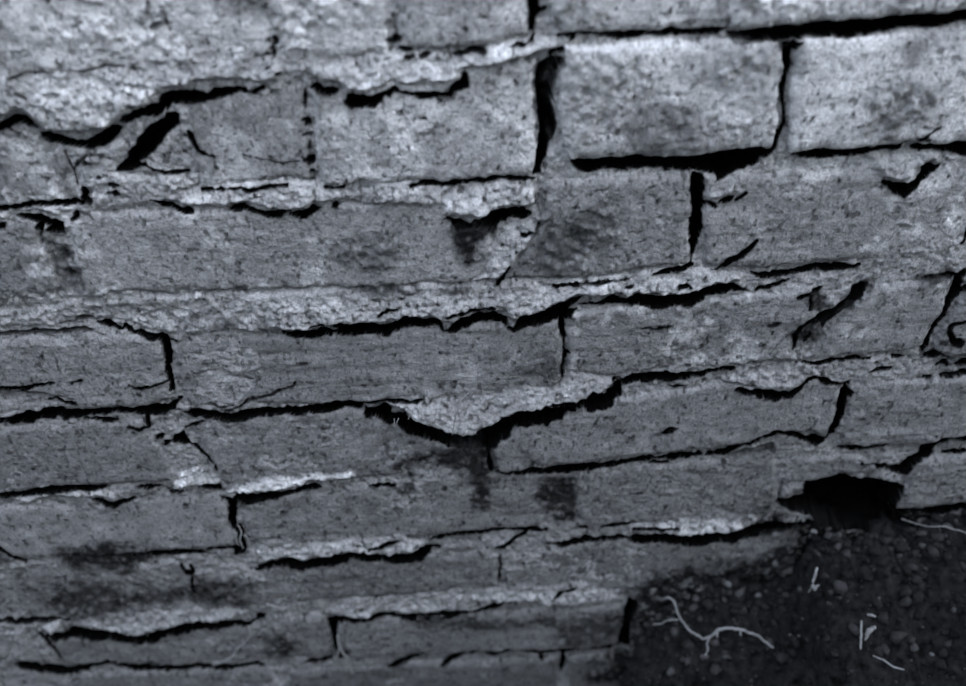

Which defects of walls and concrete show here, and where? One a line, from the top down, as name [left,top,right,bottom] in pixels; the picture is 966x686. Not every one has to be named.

crack [310,71,470,110]
crack [0,84,266,184]
crack [876,127,942,198]
crack [150,199,194,214]
crack [229,201,339,219]
crack [0,315,95,335]
crack [922,320,966,379]
crack [705,430,828,456]
spalling [780,481,804,498]
crack [127,544,238,593]
crack [255,519,813,571]
crack [35,612,266,662]